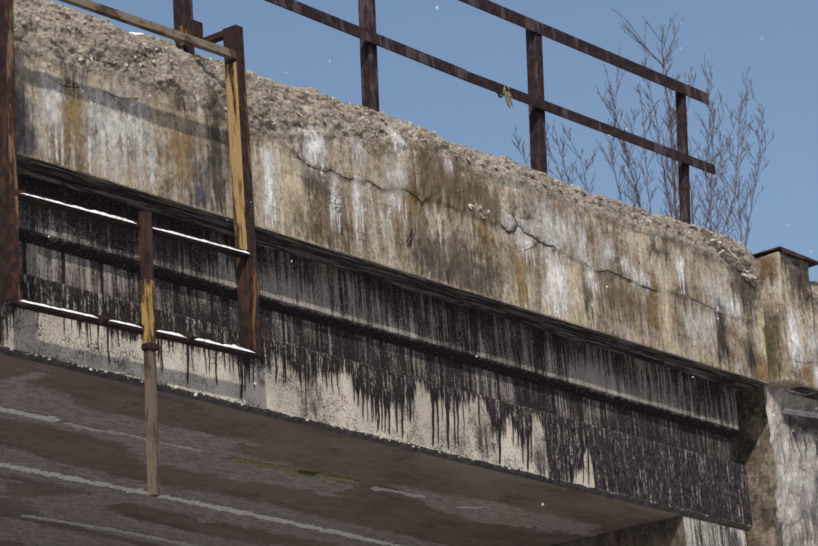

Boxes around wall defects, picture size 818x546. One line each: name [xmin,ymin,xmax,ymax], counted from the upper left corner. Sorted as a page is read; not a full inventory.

water stain [0,273,142,365]
water stain [260,126,341,251]
water stain [347,122,366,239]
water stain [384,126,408,220]
water stain [412,231,499,297]
crack [280,145,731,322]
water stain [0,372,147,464]
water stain [155,309,753,526]
water stain [370,484,601,537]
water stain [774,407,818,546]